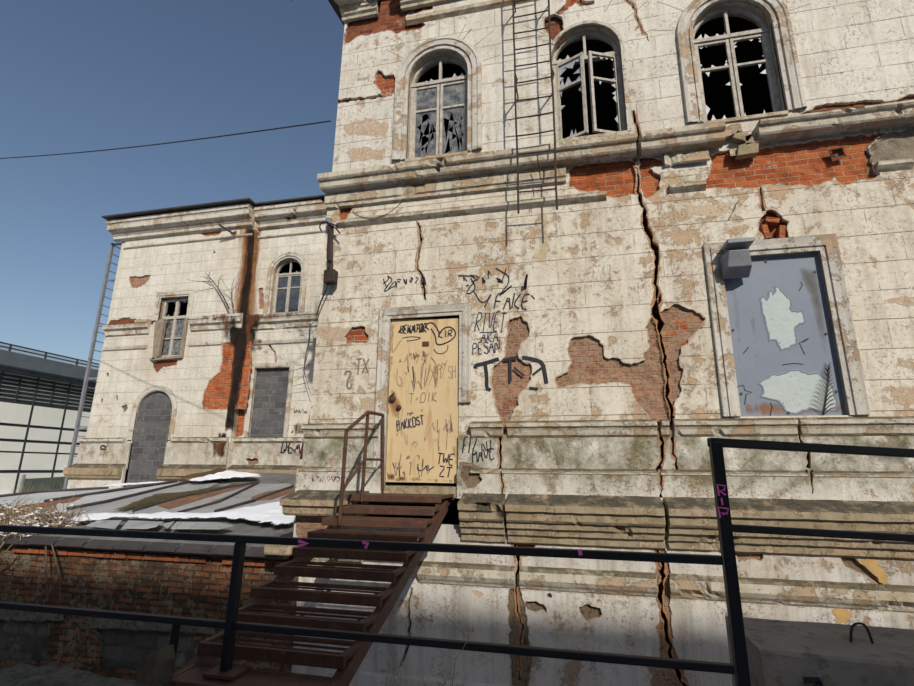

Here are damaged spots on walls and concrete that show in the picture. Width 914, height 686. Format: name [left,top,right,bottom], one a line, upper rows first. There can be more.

flaking render [343,0,433,45]
crack [625,0,646,36]
flaking render [569,156,664,200]
flaking render [706,125,914,190]
corrosion [216,227,260,335]
crack [415,222,427,300]
crack [632,113,678,497]
flaking render [202,342,252,437]
flaking render [489,317,533,433]
flaking render [554,303,706,432]
crack [497,438,506,494]
crack [656,549,689,686]